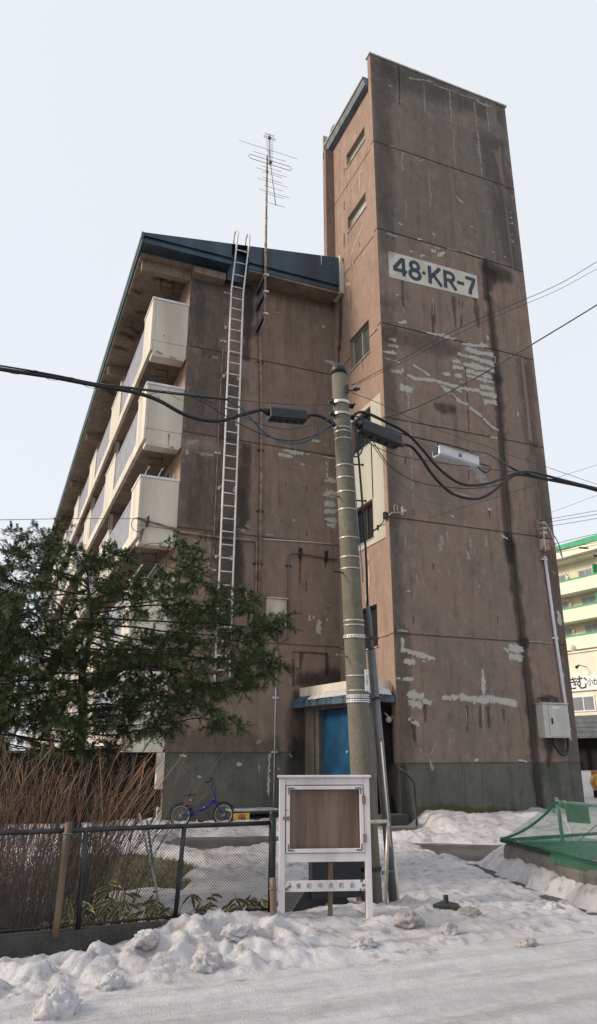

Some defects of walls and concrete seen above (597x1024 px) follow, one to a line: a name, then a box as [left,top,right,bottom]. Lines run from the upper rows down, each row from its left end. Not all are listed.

spalling [278,449,309,465]
peeling [312,439,337,529]
damp [447,248,563,808]